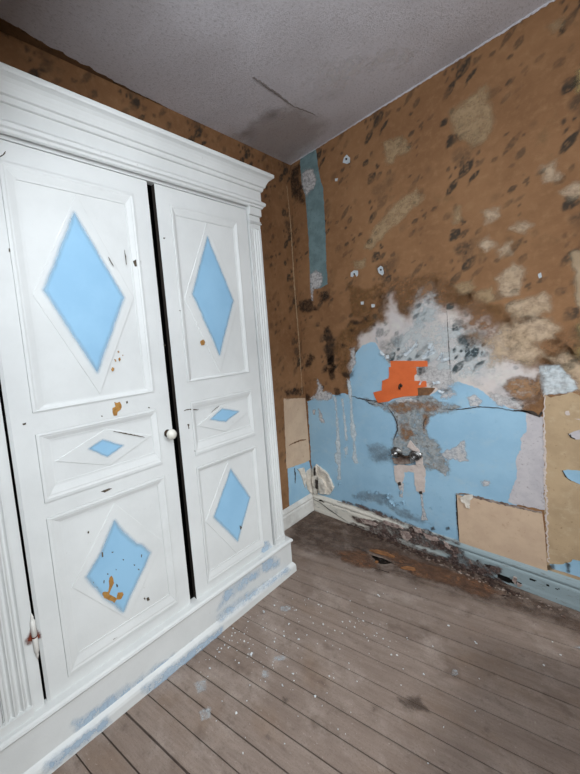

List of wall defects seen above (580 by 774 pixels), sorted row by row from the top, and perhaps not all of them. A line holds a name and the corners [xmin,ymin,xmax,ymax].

crack [253,77,315,115]
flaking render [284,379,332,469]
crack [352,396,398,439]
damp [324,277,572,480]
flaking render [360,339,580,580]